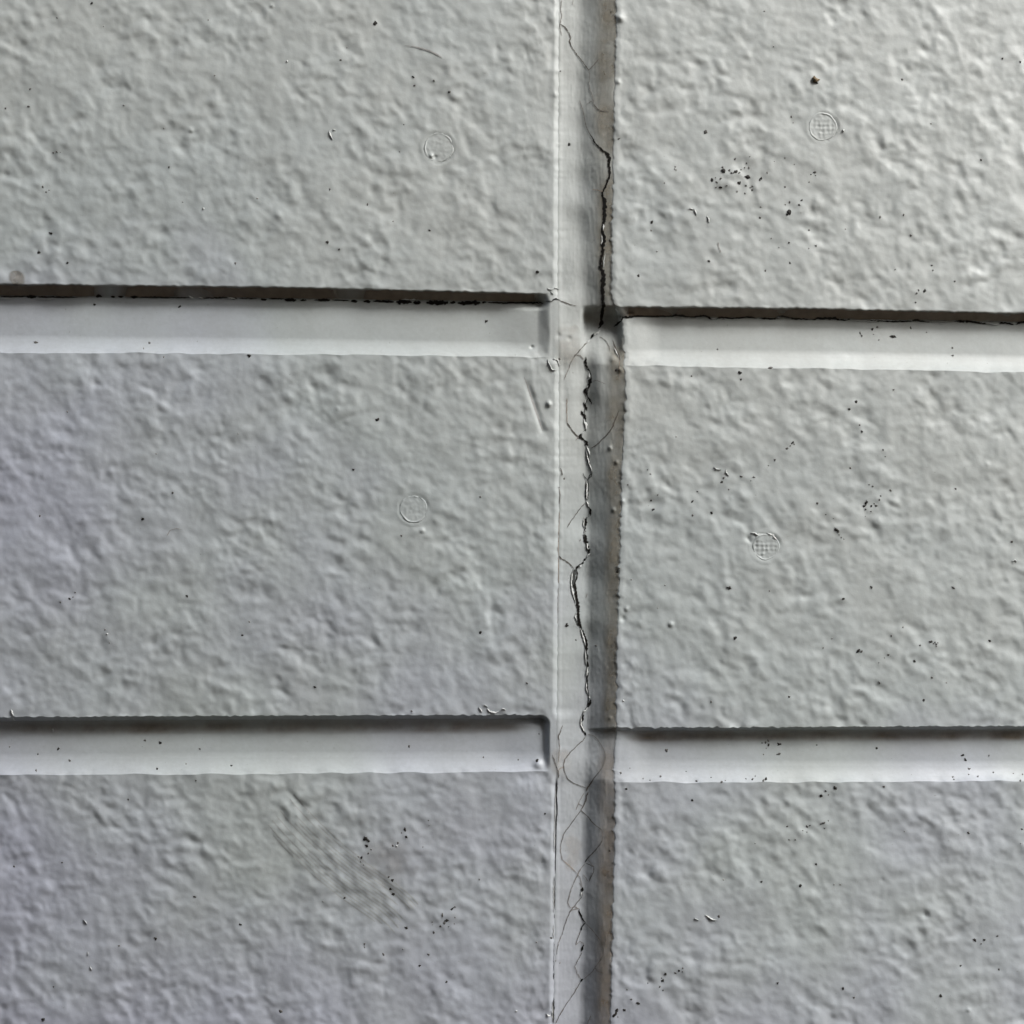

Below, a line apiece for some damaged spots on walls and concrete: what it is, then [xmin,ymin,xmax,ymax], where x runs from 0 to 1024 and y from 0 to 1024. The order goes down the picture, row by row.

crack [552,0,1024,1023]